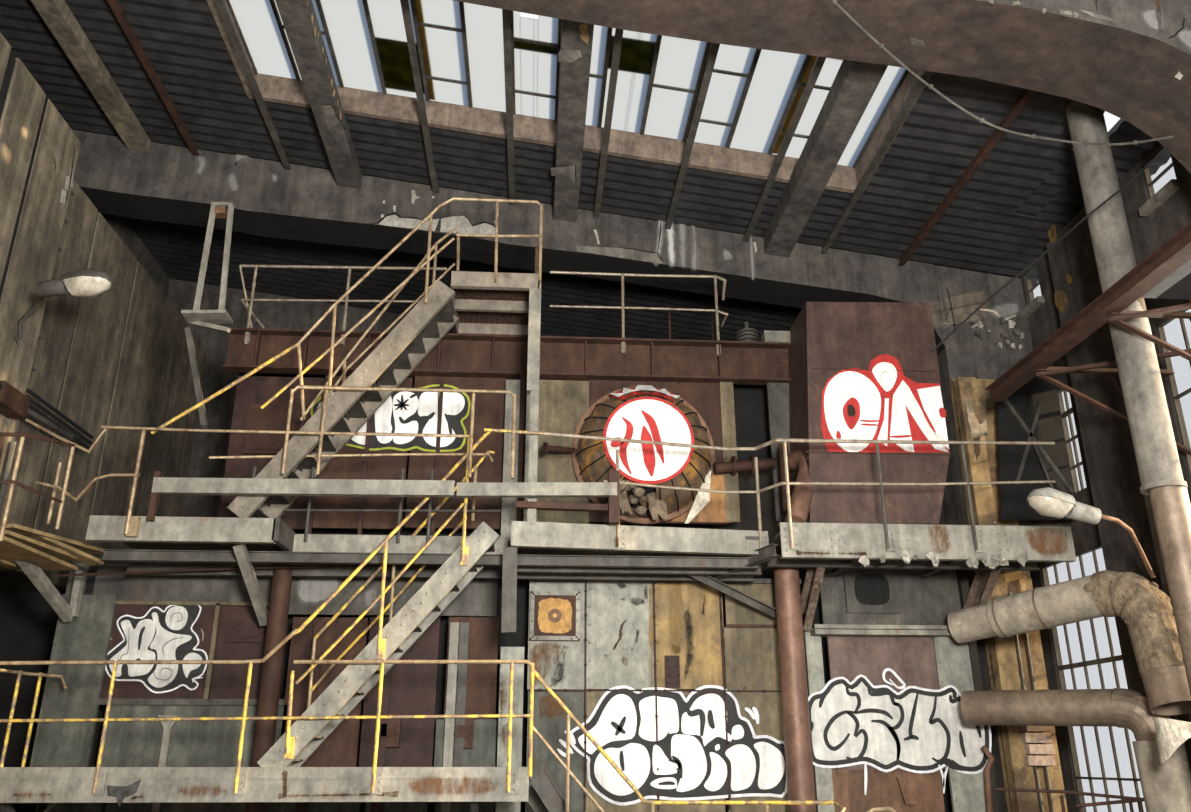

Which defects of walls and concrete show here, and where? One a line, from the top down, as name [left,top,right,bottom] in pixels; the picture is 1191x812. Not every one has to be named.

spalling [369,190,499,234]
rust [931,525,949,552]
rust [1027,528,1067,554]